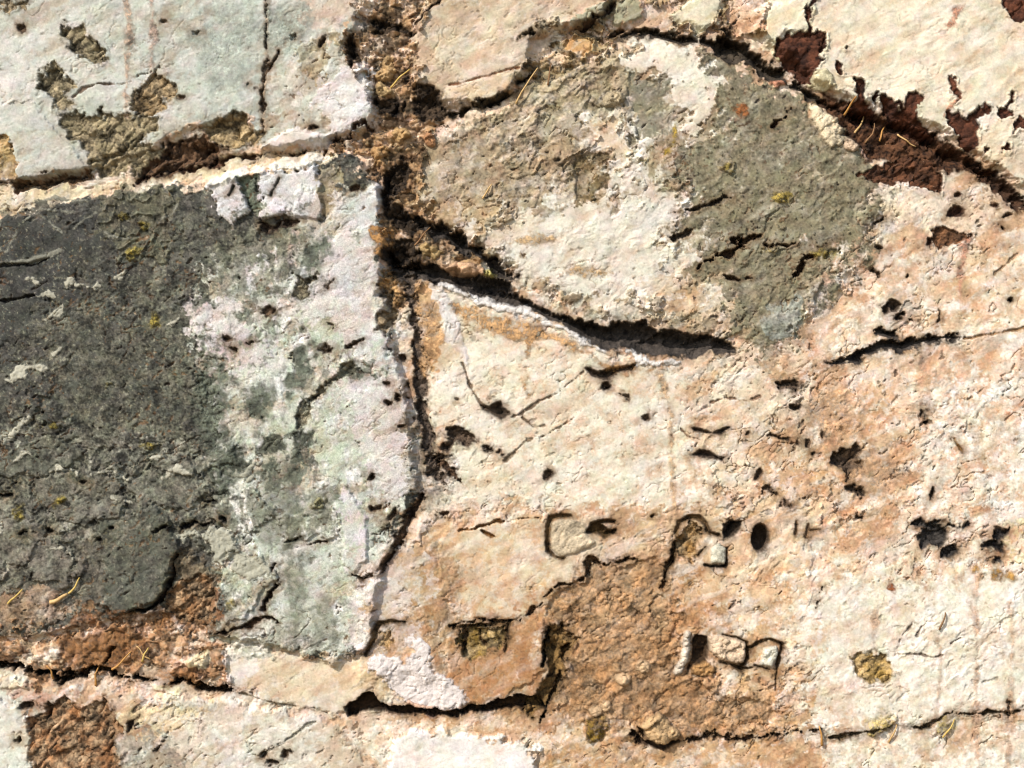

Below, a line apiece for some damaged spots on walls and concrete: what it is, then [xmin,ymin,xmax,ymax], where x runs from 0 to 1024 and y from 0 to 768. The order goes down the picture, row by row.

peeling [774,0,827,85]
spalling [37,61,266,183]
crack [581,4,1024,213]
peeling [835,61,935,147]
peeling [946,76,1024,153]
water stain [301,237,332,271]
water stain [197,363,241,498]
water stain [242,340,315,422]
crack [352,216,736,582]
crack [815,326,1024,366]
spalling [15,696,134,768]
crack [629,727,885,750]